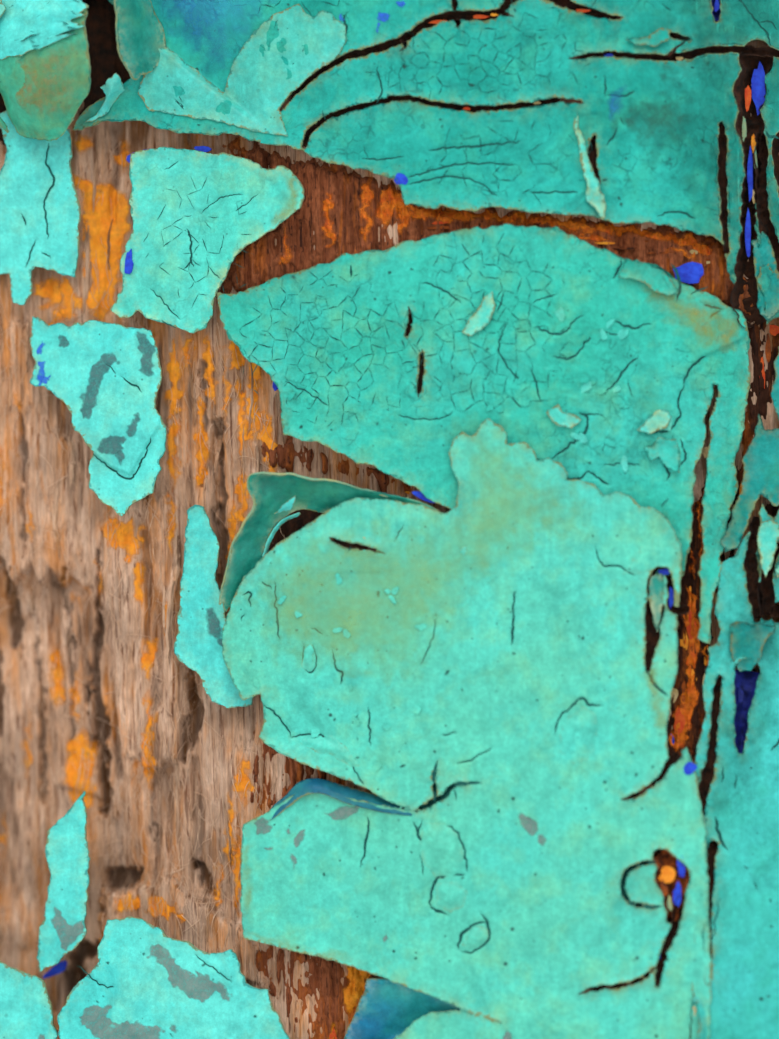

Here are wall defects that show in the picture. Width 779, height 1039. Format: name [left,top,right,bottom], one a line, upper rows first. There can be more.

crack [143,161,650,426]
peeling [30,111,779,578]
crack [203,0,779,328]
crack [552,355,707,507]
peeling [0,791,460,1039]
peeling [174,425,444,709]
peeling [250,720,419,826]
crack [555,697,603,733]
crack [595,547,690,695]
crack [578,670,760,995]
peeling [664,478,718,775]
crack [744,516,779,619]